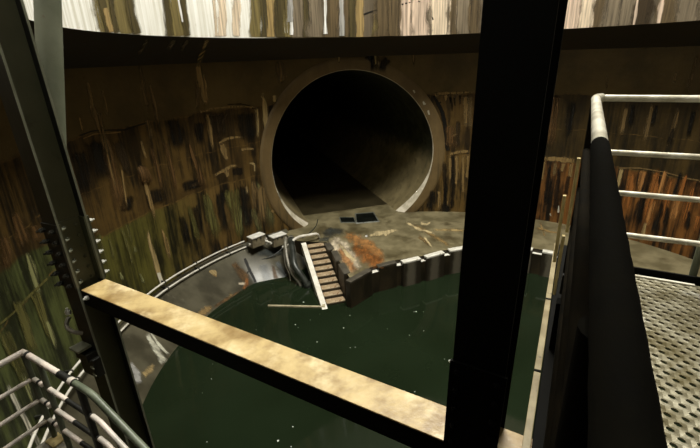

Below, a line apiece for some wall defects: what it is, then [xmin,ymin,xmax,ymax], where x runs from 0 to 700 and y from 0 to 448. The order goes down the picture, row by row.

leakage [72,82,132,192]
leakage [238,96,276,138]
leakage [179,180,274,242]
leakage [633,170,652,222]
leakage [652,202,669,235]
rust [331,234,382,271]